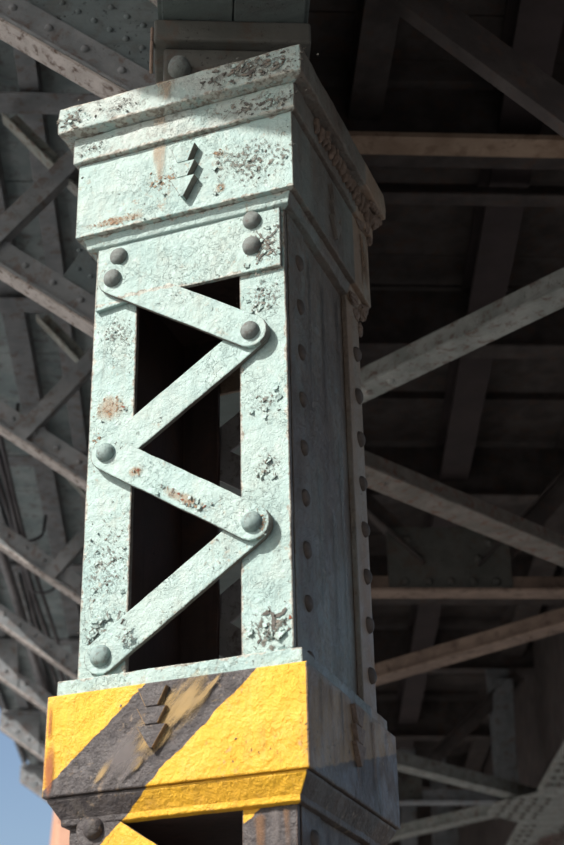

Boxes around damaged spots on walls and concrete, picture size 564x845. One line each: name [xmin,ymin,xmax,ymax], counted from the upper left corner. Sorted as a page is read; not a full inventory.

peeling [200,45,319,93]
peeling [57,90,151,133]
peeling [202,89,307,122]
peeling [144,168,176,195]
peeling [205,131,294,190]
peeling [248,385,286,426]
peeling [247,448,282,484]
peeling [243,601,294,652]
peeling [95,676,219,781]